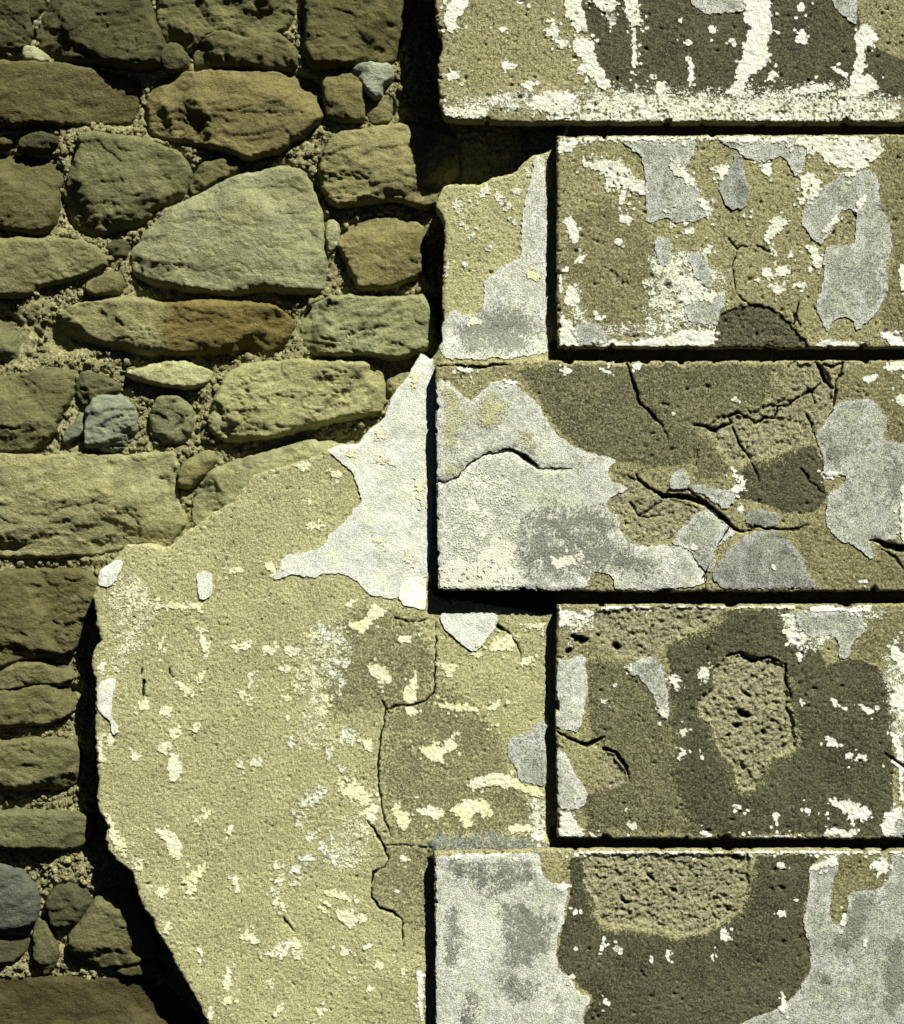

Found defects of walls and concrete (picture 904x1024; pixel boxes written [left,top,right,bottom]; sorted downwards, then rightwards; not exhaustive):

peeling [440,0,469,34]
peeling [442,97,492,119]
peeling [506,0,903,123]
crack [437,362,506,370]
crack [437,449,570,483]
flaking render [224,135,904,721]
crack [625,361,844,590]
crack [869,539,904,570]
flaking render [96,653,119,762]
crack [367,617,438,946]
flaking render [266,605,904,1024]
crack [557,731,630,779]